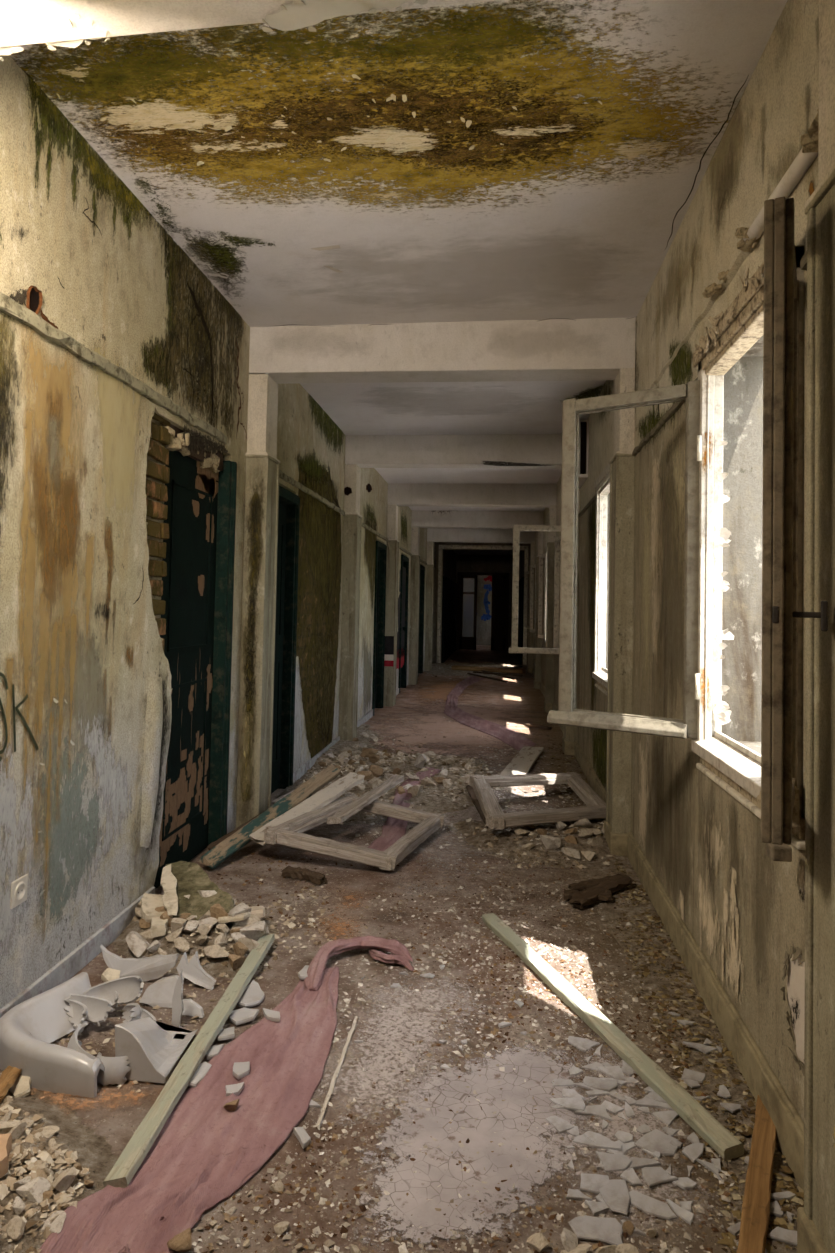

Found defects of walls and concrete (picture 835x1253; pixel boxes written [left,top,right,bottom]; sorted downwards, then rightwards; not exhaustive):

peeling [261,0,428,32]
damp [25,74,275,443]
damp [0,311,17,509]
damp [93,348,140,513]
flaking render [145,411,230,651]
damp [0,623,132,962]
damp [151,673,168,839]
spalling [157,731,209,916]
peeling [188,664,213,712]
damp [293,666,303,773]
peeling [780,945,805,1076]